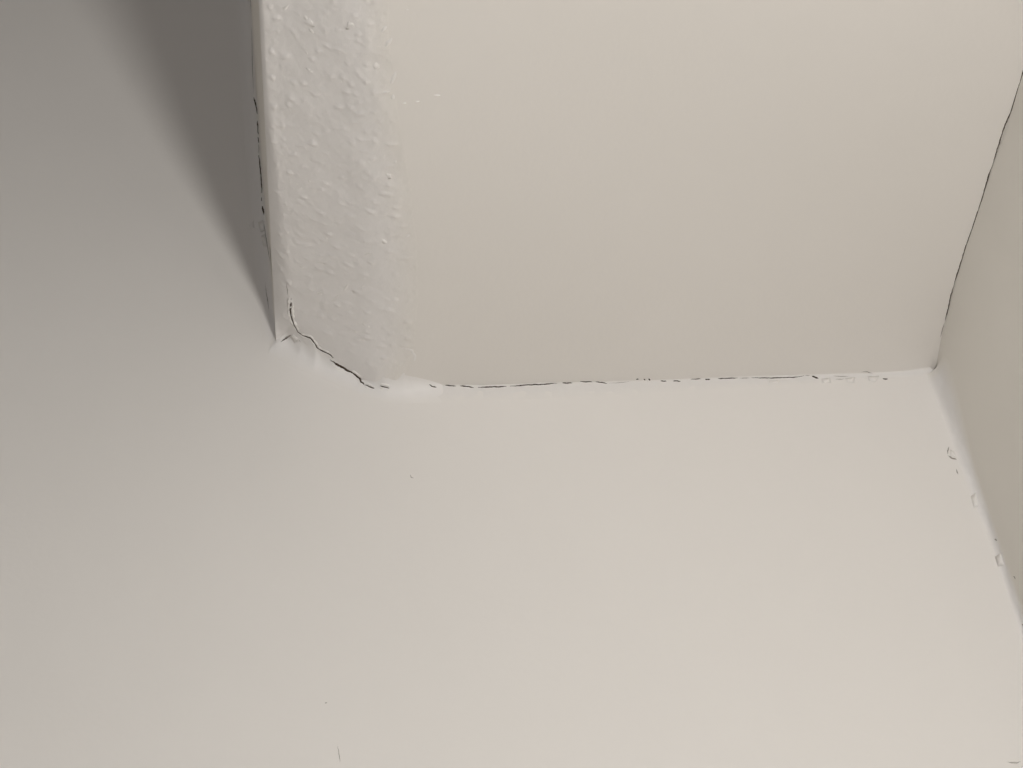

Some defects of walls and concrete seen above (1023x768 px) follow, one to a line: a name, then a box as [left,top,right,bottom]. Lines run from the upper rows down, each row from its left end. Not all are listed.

crack [252,63,269,255]
crack [265,286,390,391]
crack [429,372,887,389]